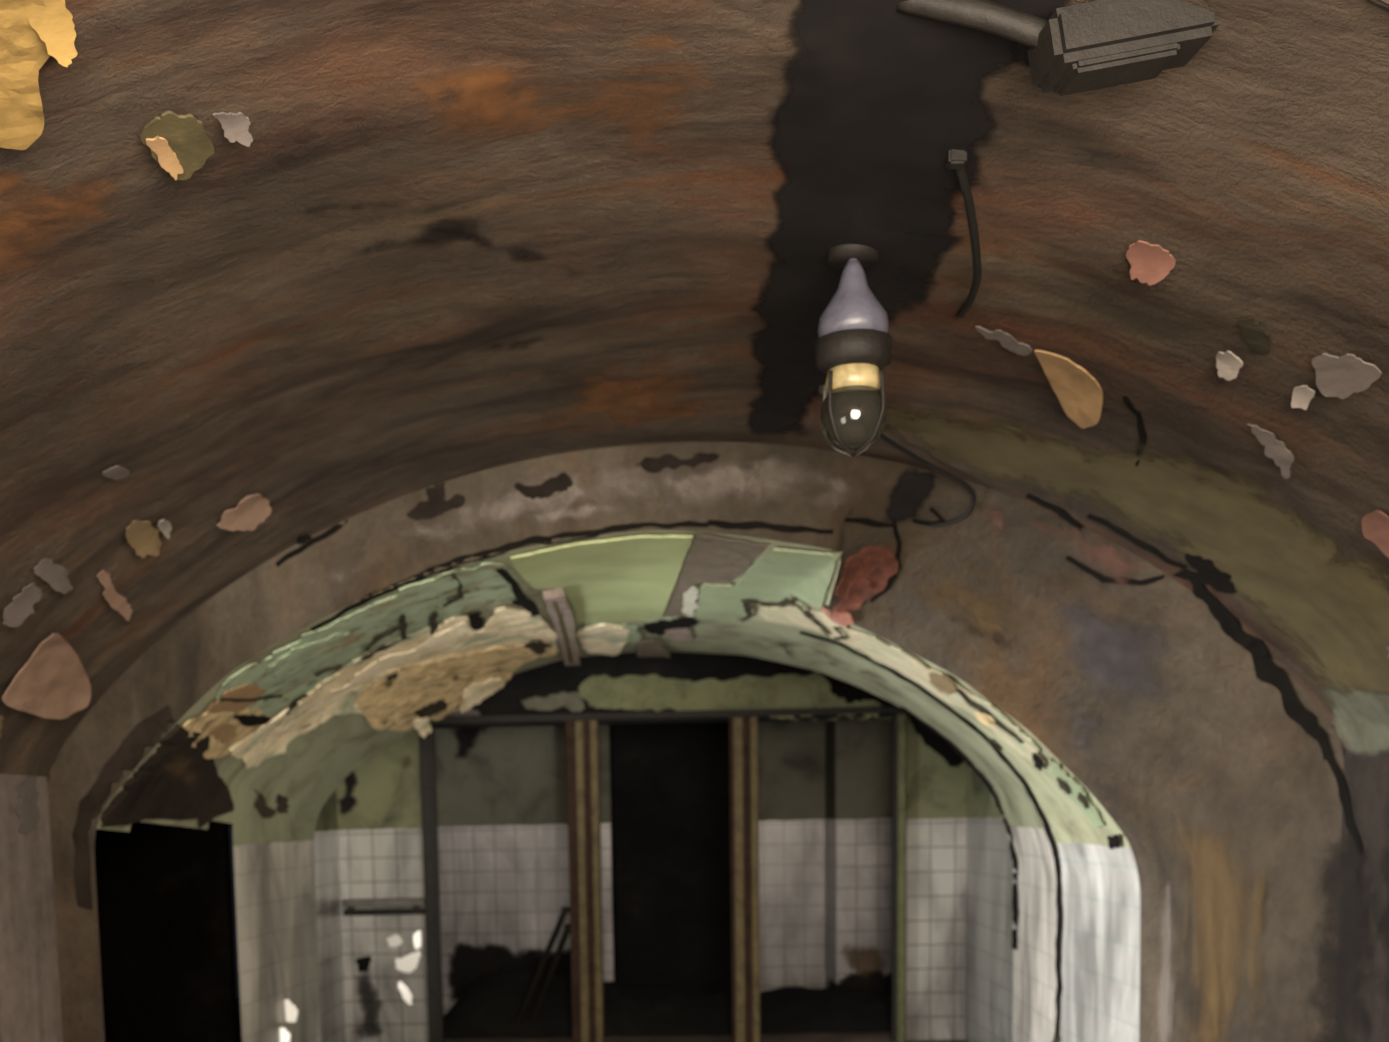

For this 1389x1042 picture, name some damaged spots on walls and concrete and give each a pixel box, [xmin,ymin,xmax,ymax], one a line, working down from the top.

peeling [0,0,78,150]
peeling [1125,240,1176,286]
peeling [976,326,1103,429]
peeling [1291,353,1382,411]
peeling [0,633,91,736]
peeling [217,494,272,531]
crack [220,470,946,715]
flaking render [72,534,1120,909]
crack [740,598,1062,1042]
peeling [883,407,1389,755]
crack [1025,494,1363,855]
leakage [1314,835,1389,1042]